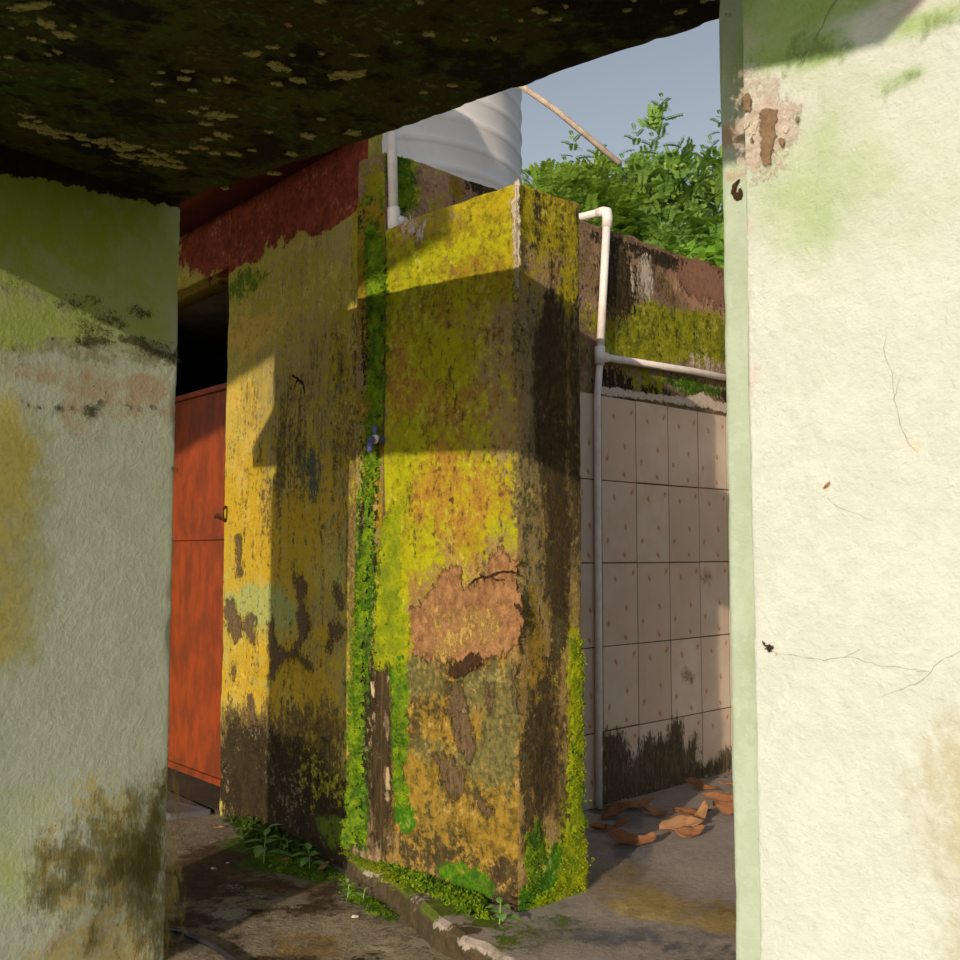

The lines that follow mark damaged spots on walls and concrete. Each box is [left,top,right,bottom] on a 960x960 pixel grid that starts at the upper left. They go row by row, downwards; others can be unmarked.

peeling [730,70,801,213]
leakage [53,295,181,366]
spalling [408,544,524,820]
leakage [602,712,732,805]
leakage [25,766,189,960]